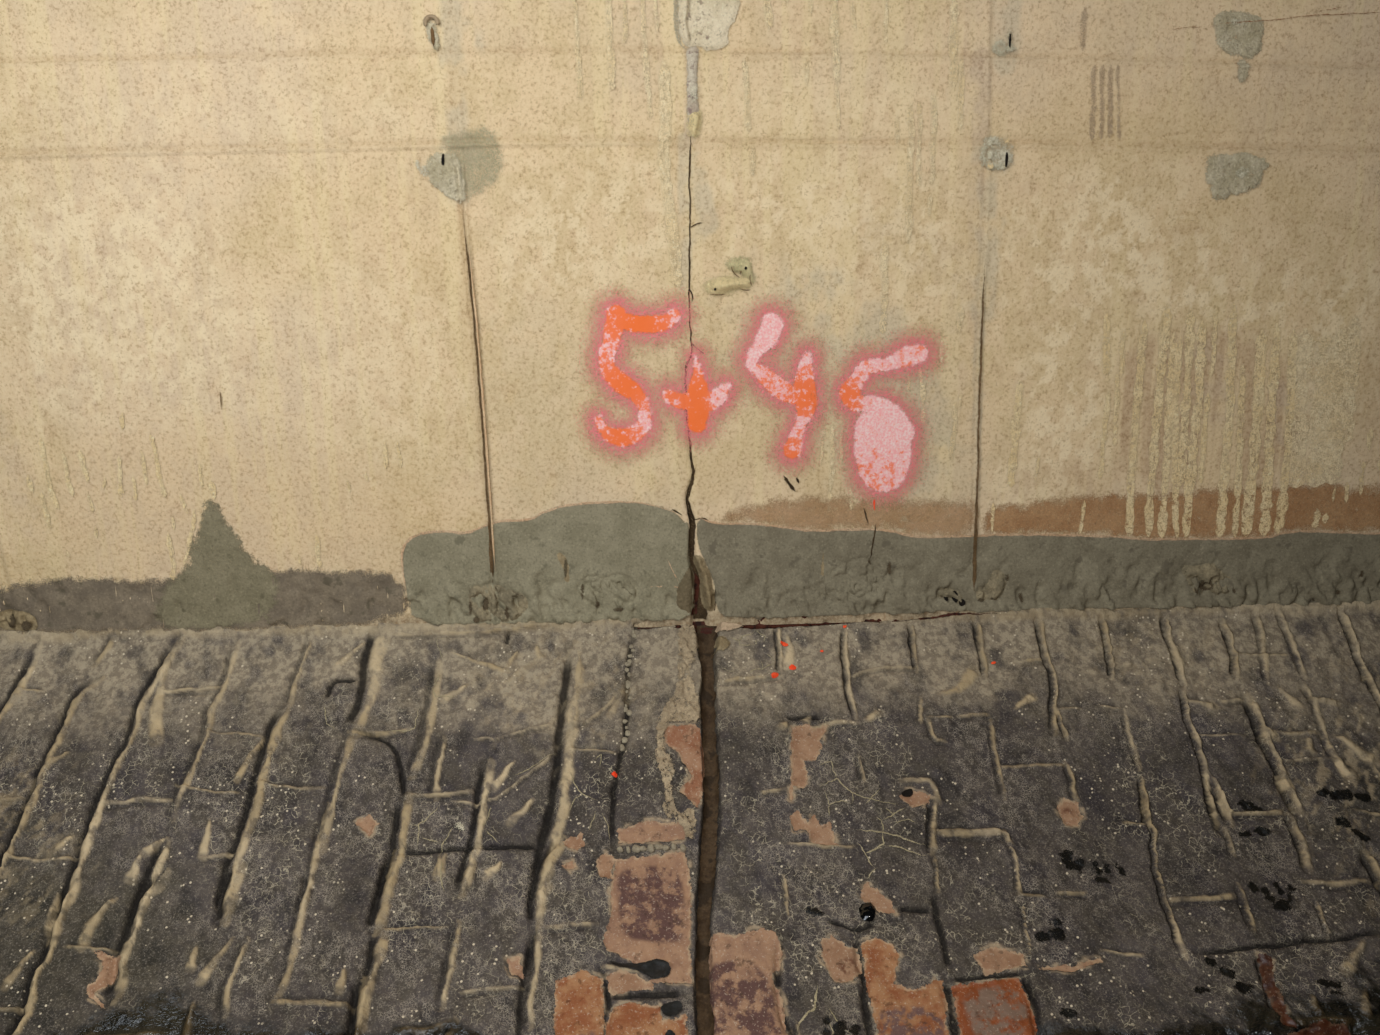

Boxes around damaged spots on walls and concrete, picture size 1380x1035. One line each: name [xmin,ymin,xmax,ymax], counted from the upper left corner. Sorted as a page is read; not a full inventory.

crack [462,210,495,582]
water stain [0,303,1380,634]
crack [637,136,997,1035]
peeling [505,956,525,979]
peeling [553,625,787,1035]
peeling [789,724,839,846]
peeling [820,935,1103,1035]